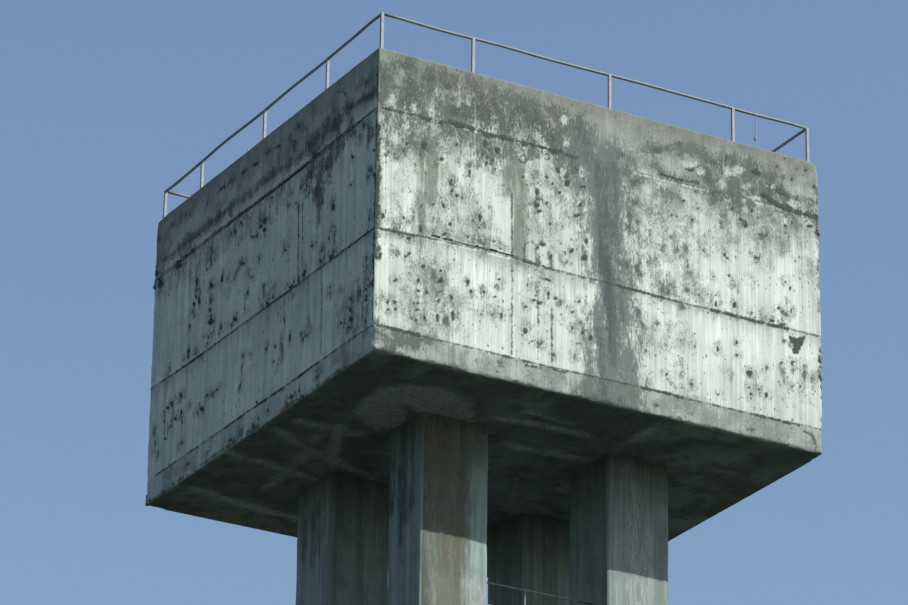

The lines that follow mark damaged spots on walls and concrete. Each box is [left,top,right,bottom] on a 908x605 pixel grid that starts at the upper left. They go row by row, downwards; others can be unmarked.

leakage [155,55,659,413]
leakage [641,140,819,238]
spalling [655,273,816,392]